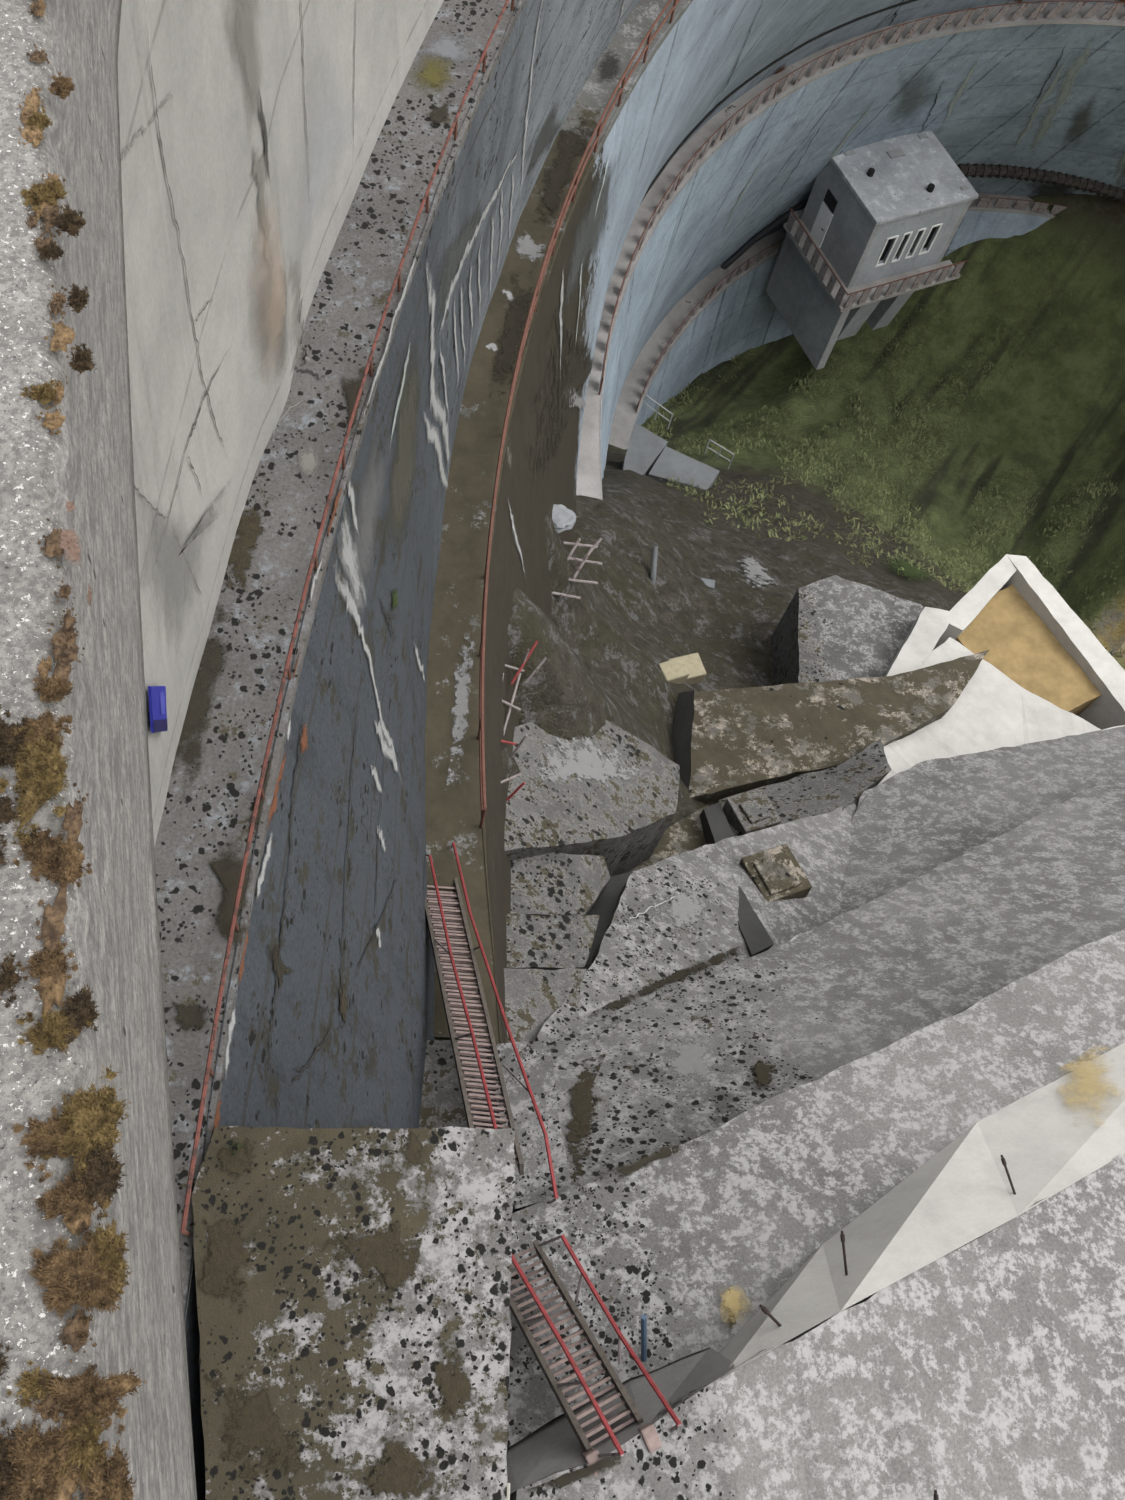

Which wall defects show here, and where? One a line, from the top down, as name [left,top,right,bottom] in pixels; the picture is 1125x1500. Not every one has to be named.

leakage [232,0,271,265]
crack [1032,49,1064,107]
crack [121,55,224,595]